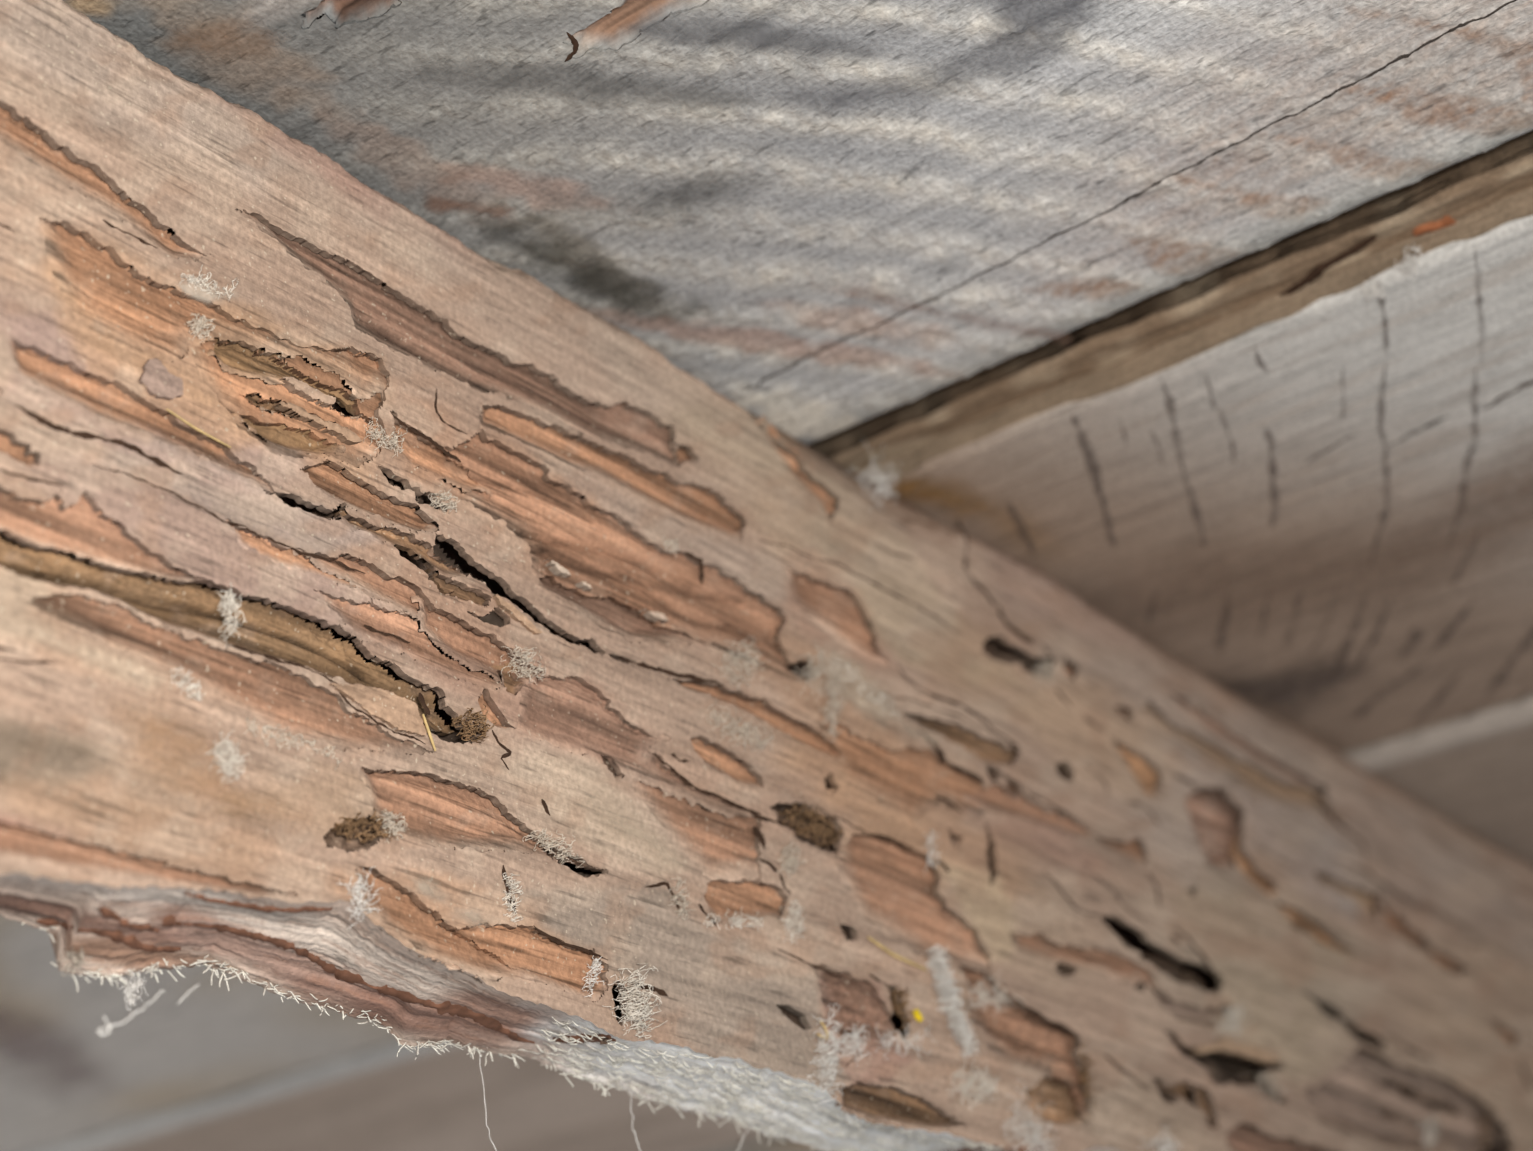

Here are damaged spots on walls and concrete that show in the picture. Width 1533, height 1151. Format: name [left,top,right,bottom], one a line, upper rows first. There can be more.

peeling [301,0,401,28]
peeling [563,0,707,58]
crack [744,0,1517,391]
peeling [272,376,363,445]
crack [1306,380,1533,463]
peeling [489,594,543,635]
peeling [638,609,669,624]
peeling [329,683,427,737]
peeling [1189,1039,1284,1064]